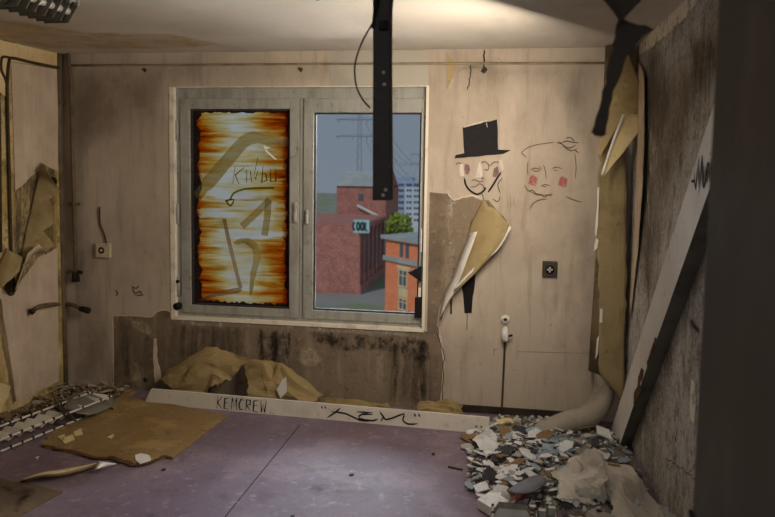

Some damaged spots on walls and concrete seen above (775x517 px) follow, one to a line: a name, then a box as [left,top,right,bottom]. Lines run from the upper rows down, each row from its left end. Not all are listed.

water stain [258,326,291,364]
water stain [314,327,427,401]